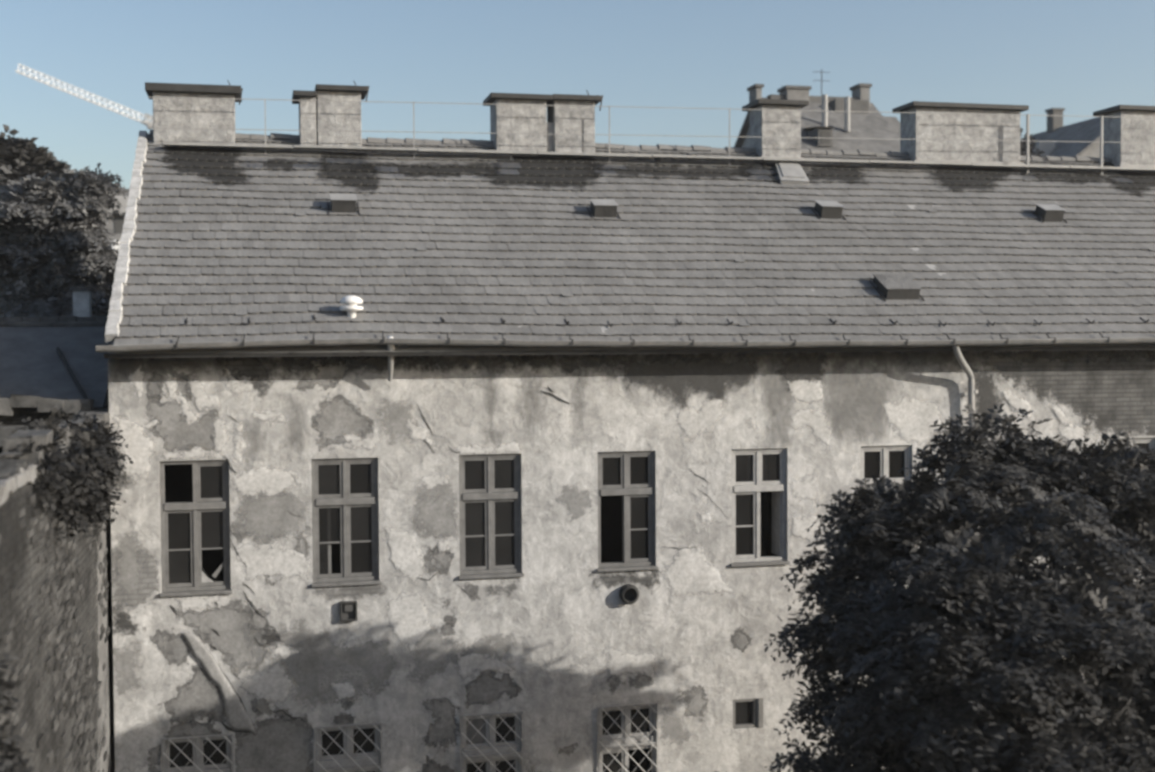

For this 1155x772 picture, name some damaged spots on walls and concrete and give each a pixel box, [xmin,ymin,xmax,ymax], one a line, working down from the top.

damp [110,357,229,377]
damp [250,350,1155,429]
peeling [677,396,727,443]
peeling [787,380,834,450]
peeling [882,397,941,444]
spalling [557,486,591,519]
peeling [590,543,734,597]
spalling [731,627,752,652]
peeling [601,646,656,692]
spalling [661,686,708,745]